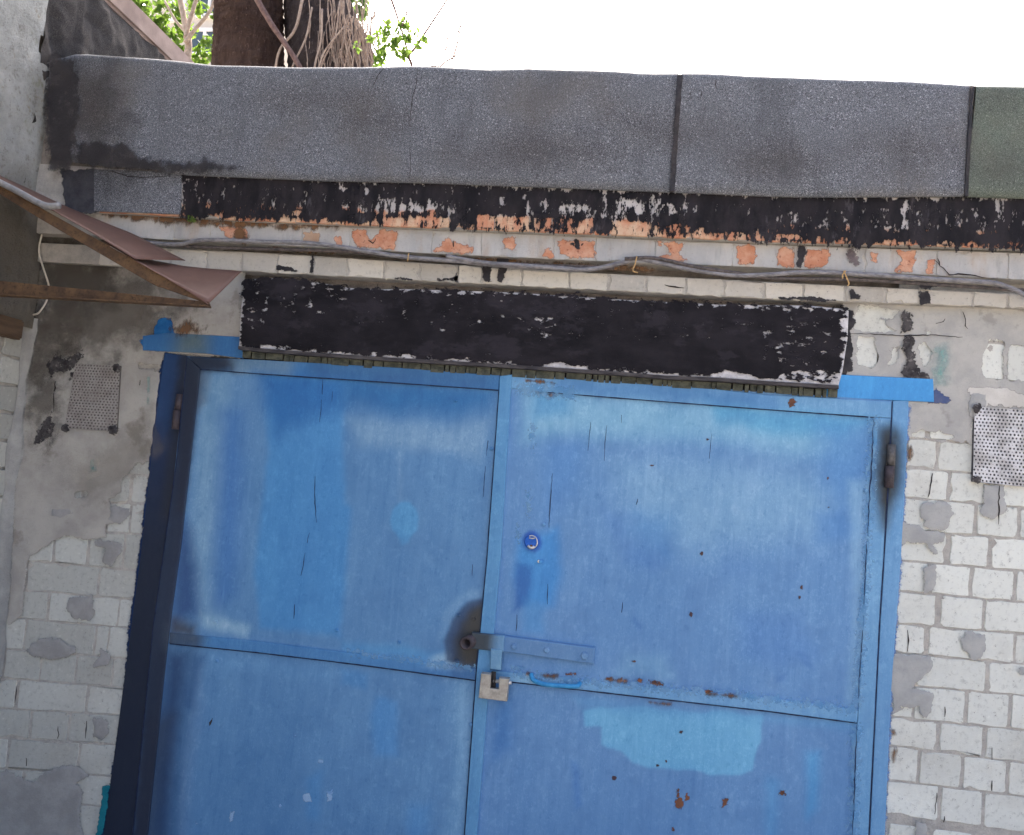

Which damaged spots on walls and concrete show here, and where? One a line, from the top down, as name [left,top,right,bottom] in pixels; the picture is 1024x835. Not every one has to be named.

spalling [219,226,248,238]
spalling [334,229,398,250]
spalling [434,238,474,255]
spalling [542,239,597,259]
corrosion [606,677,663,686]
corrosion [675,788,690,809]